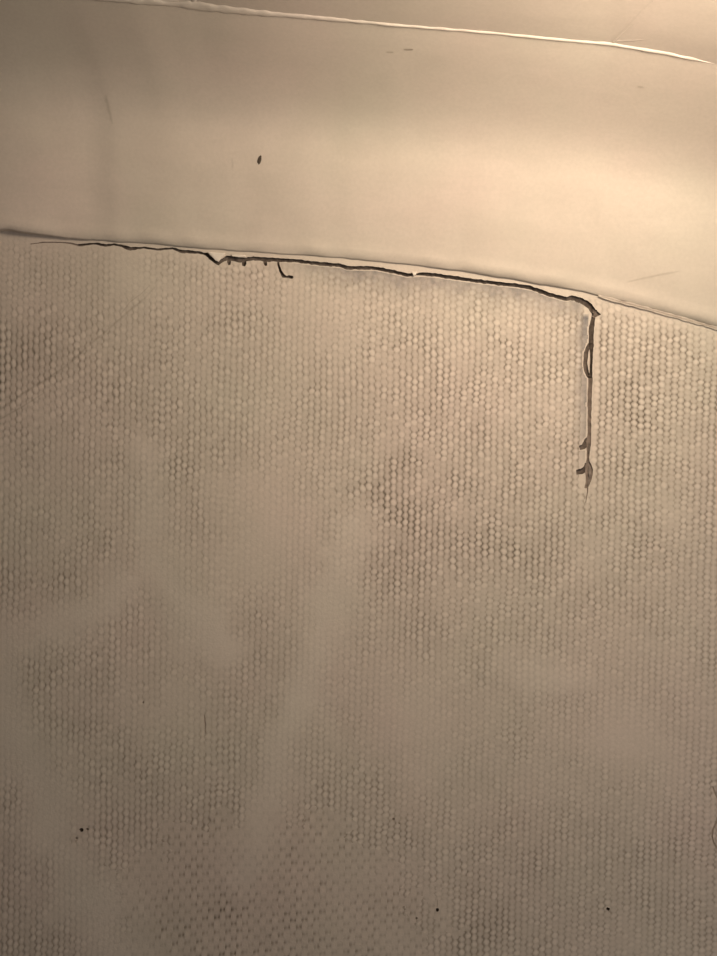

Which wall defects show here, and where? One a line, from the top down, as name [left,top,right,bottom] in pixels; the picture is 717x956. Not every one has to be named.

crack [30,242,717,503]